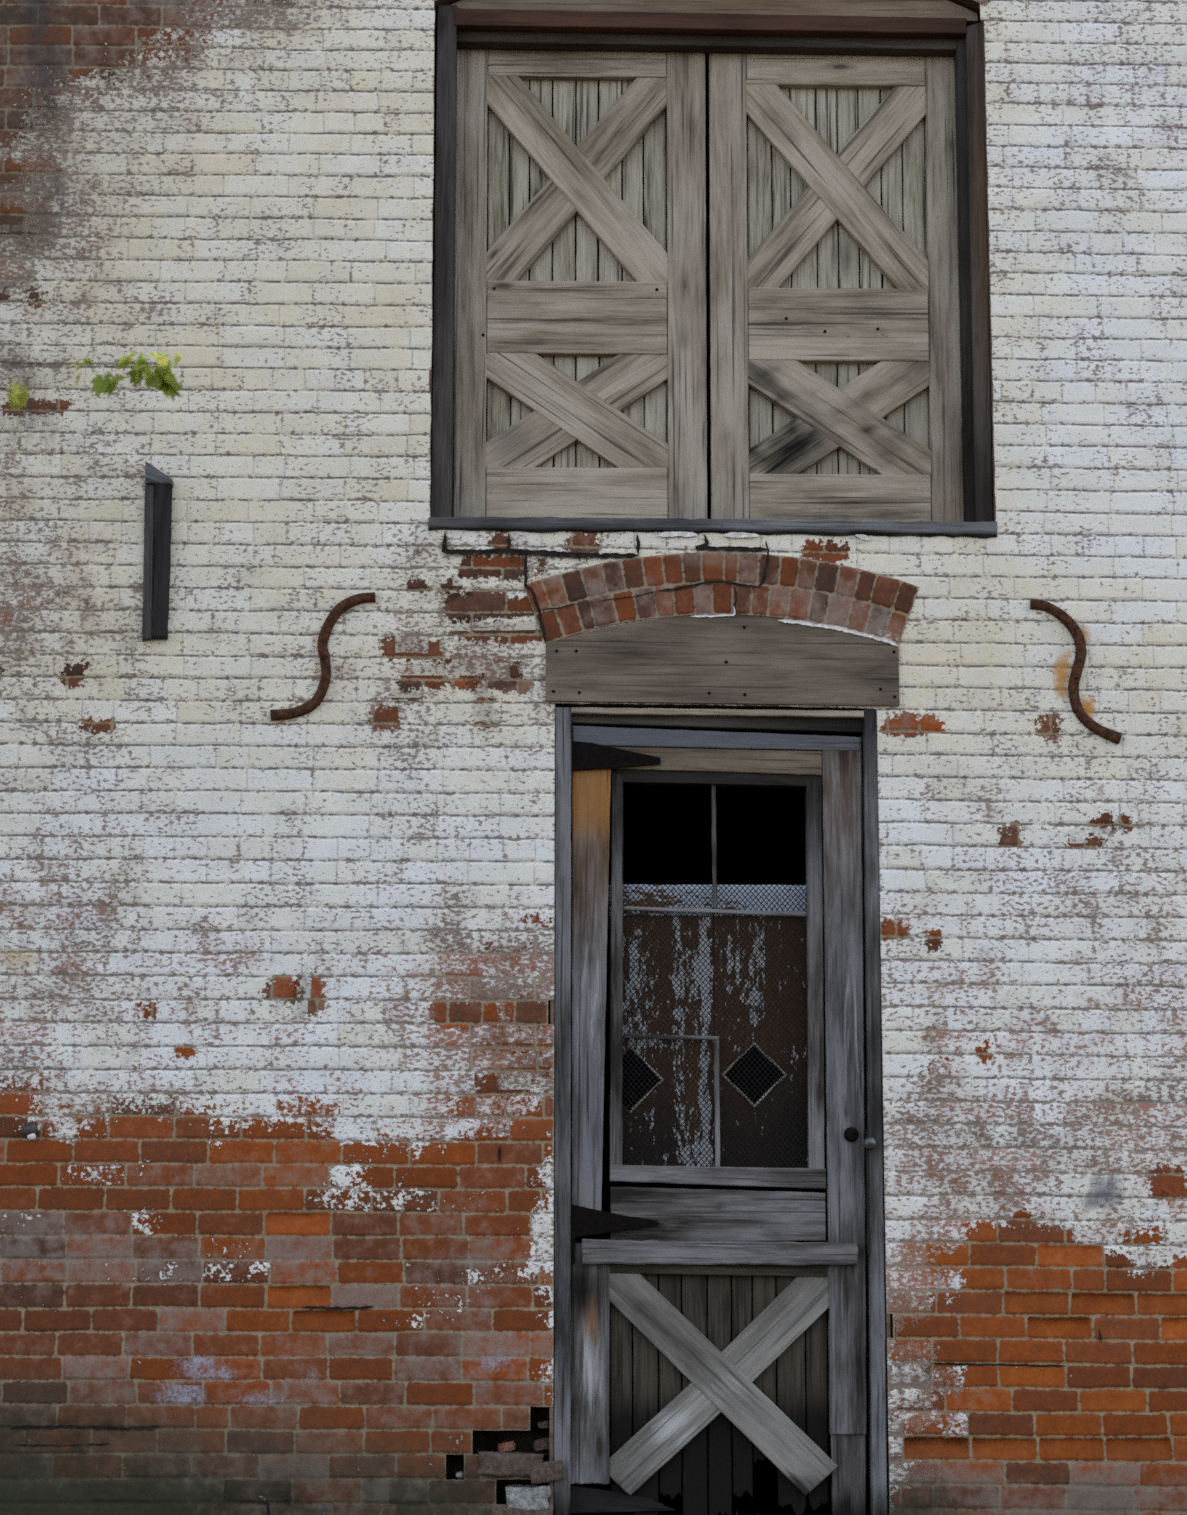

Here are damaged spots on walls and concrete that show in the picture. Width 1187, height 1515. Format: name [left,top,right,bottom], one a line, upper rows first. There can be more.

peeling [0,0,295,238]
peeling [0,282,48,309]
peeling [0,397,72,419]
peeling [800,537,857,565]
peeling [366,531,548,737]
peeling [59,658,90,690]
corrosion [1056,654,1070,696]
peeling [76,709,120,735]
peeling [880,709,946,739]
peeling [261,973,329,1022]
peeling [0,993,554,1515]
peeling [888,1160,1187,1515]